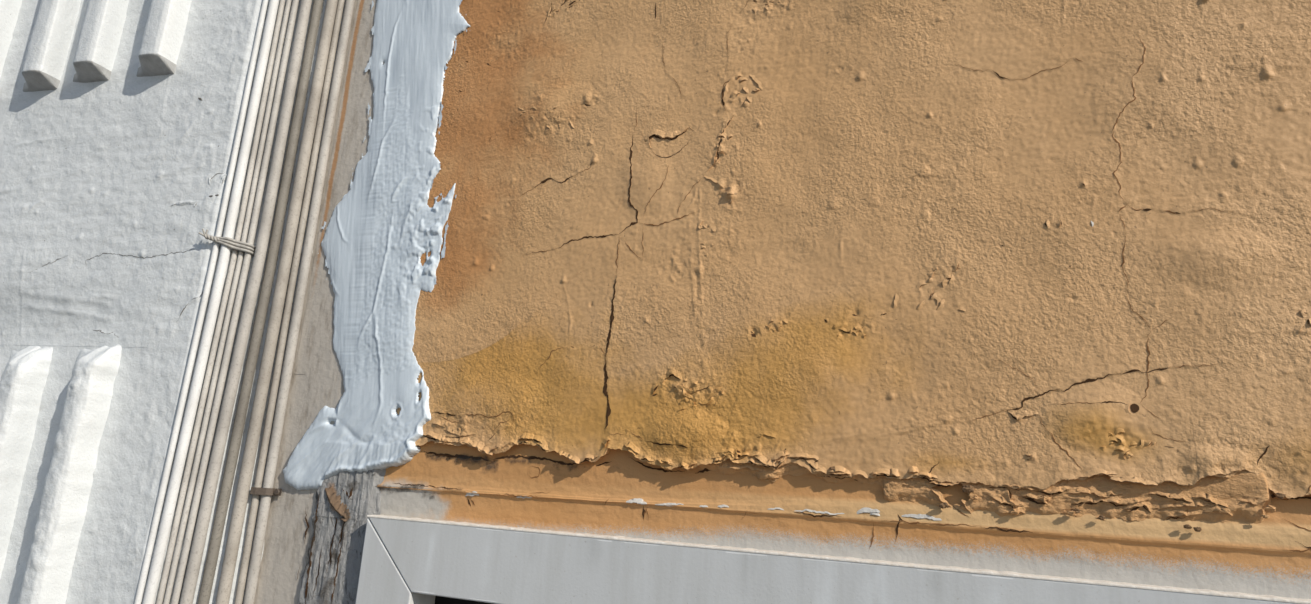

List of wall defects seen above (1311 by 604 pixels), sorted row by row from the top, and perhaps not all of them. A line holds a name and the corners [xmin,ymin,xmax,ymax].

crack [394,1,748,506]
crack [974,39,1224,469]
spalling [423,421,1286,532]